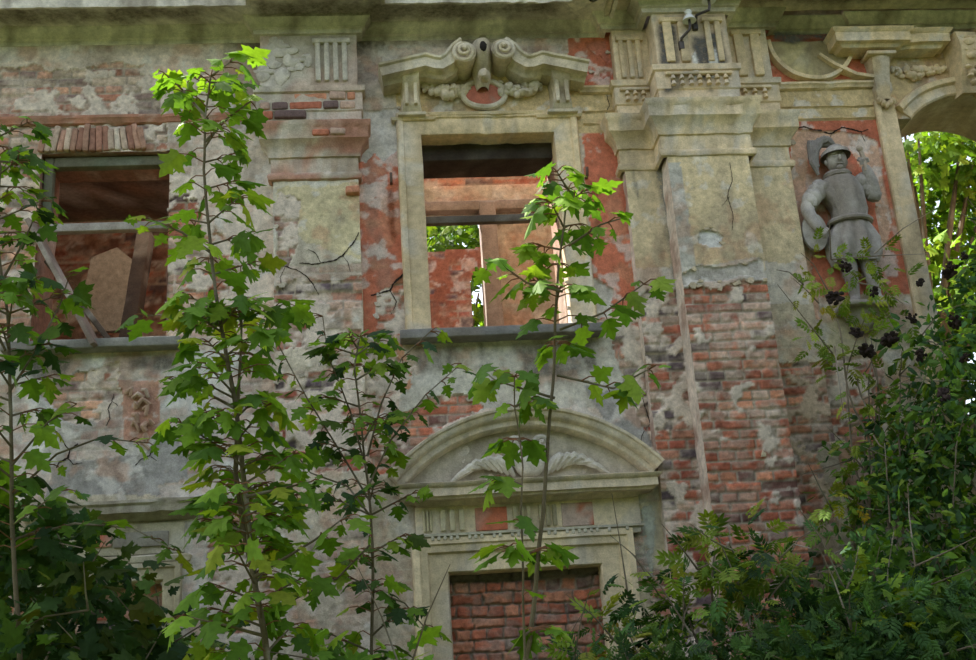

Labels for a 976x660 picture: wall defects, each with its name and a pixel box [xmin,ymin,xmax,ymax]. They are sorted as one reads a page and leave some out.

spalling [0,61,169,282]
spalling [0,300,31,342]
spalling [274,191,302,266]
crack [280,232,359,295]
crack [371,274,403,314]
peeling [699,227,726,247]
spalling [41,360,124,425]
spalling [273,275,484,474]
spalling [612,258,888,660]